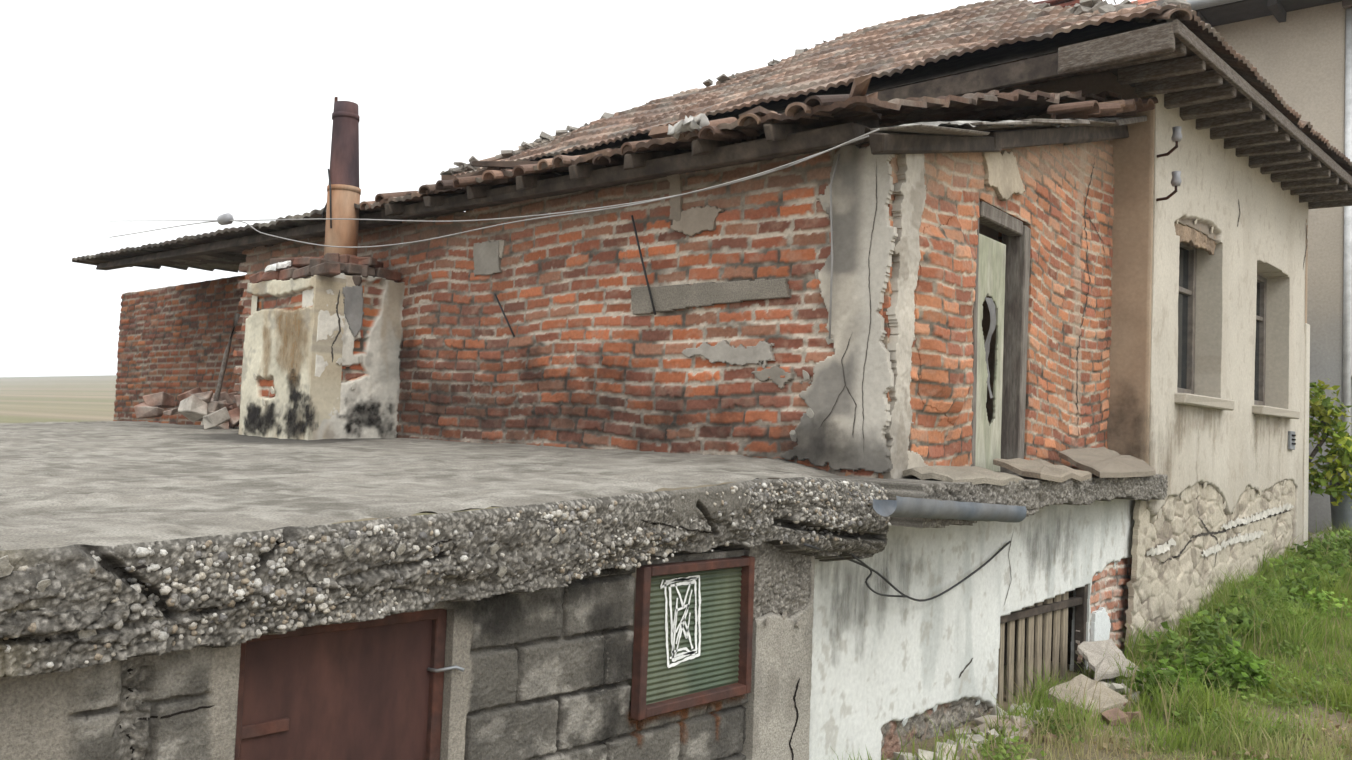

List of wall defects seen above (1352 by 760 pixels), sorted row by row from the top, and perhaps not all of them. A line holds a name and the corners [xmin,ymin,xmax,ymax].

crack [819,161,877,450]
peeling [780,144,927,479]
peeling [253,373,275,406]
peeling [336,355,365,390]
damp [244,403,281,436]
crack [102,565,163,607]
peeling [1044,479,1296,716]